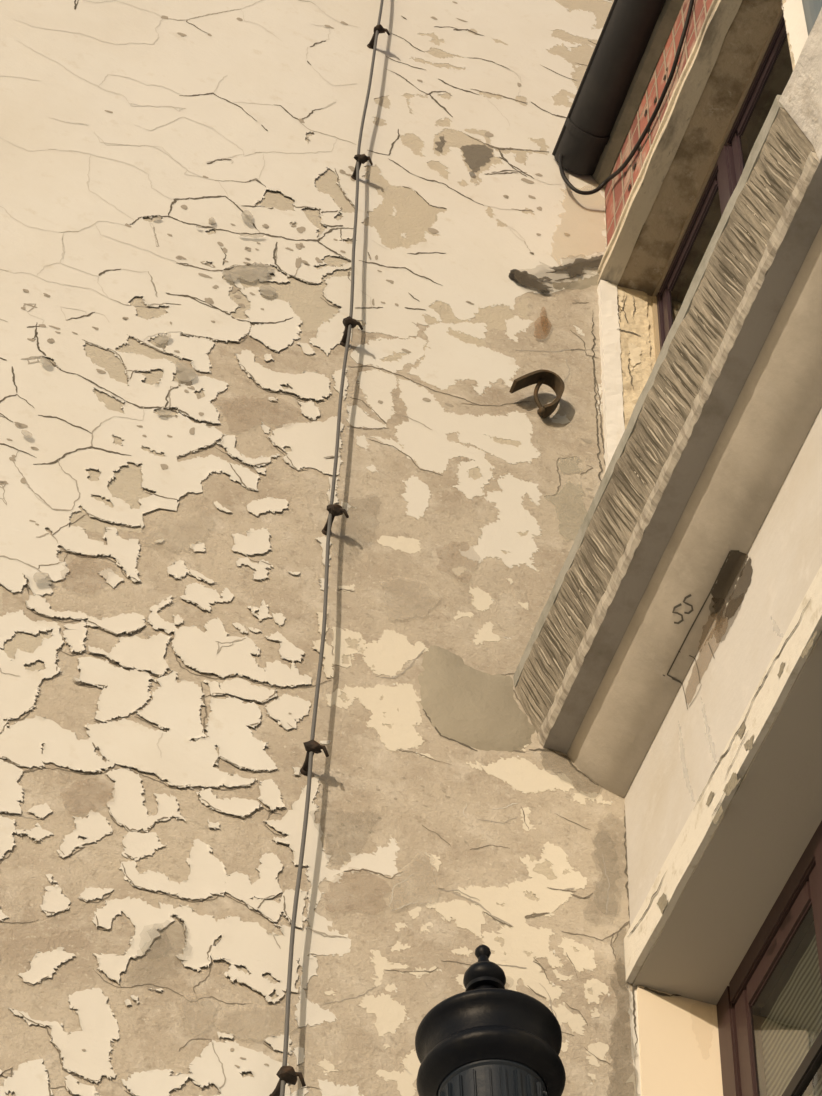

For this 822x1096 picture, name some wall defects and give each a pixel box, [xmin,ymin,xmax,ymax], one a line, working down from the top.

peeling [256,191,327,238]
peeling [314,165,447,284]
spalling [521,173,543,215]
crack [0,0,640,732]
peeling [0,239,822,1096]
crack [0,706,283,836]
crack [398,709,477,765]
crack [513,748,598,785]
crack [0,811,347,1004]
crack [325,961,470,1004]
crack [347,811,681,1096]
crack [18,1011,138,1096]